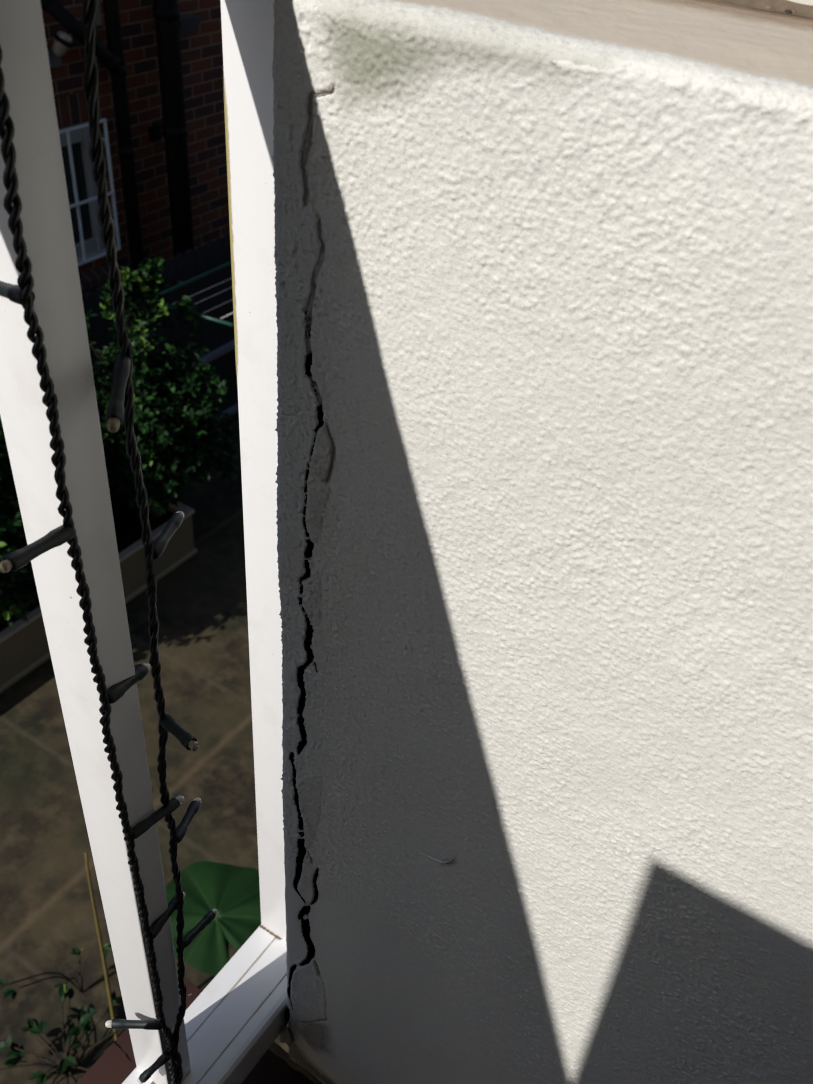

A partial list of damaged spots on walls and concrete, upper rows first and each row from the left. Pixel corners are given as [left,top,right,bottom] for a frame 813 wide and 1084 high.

crack [284,86,334,1025]